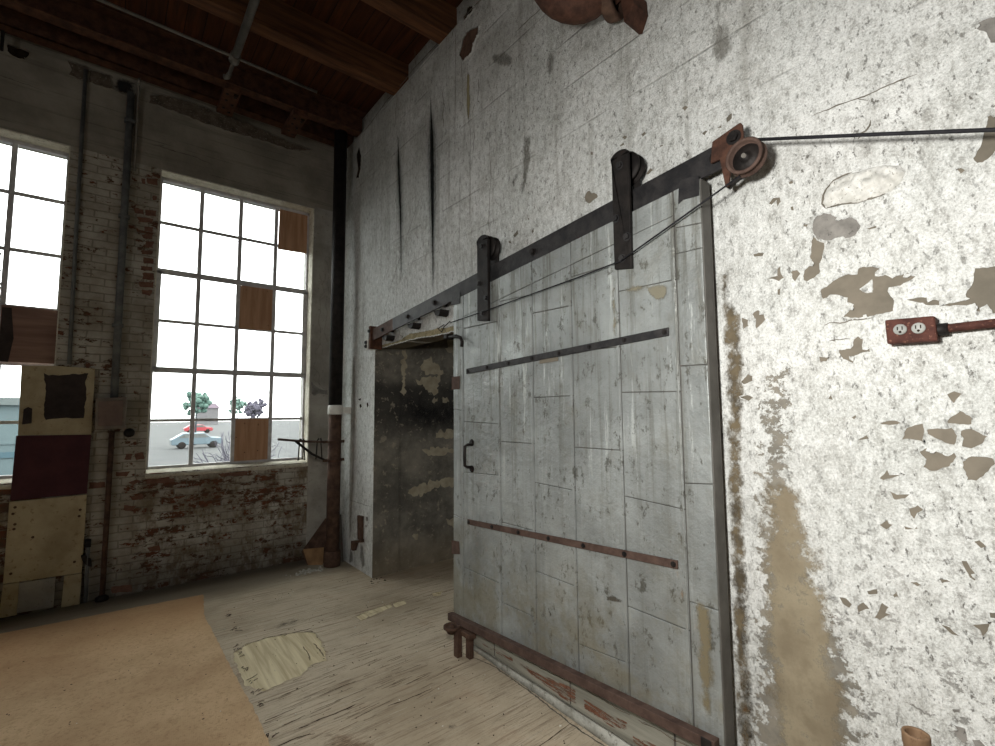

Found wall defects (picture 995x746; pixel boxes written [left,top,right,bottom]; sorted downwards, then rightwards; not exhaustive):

spalling [459,4,480,62]
peeling [954,112,995,176]
peeling [765,195,995,320]
peeling [740,308,768,331]
peeling [817,334,872,364]
peeling [857,388,995,483]
leakage [722,274,754,746]
peeling [739,362,820,746]
peeling [877,468,926,532]
leakage [760,481,845,746]
peeling [816,587,901,746]
peeling [970,610,995,641]